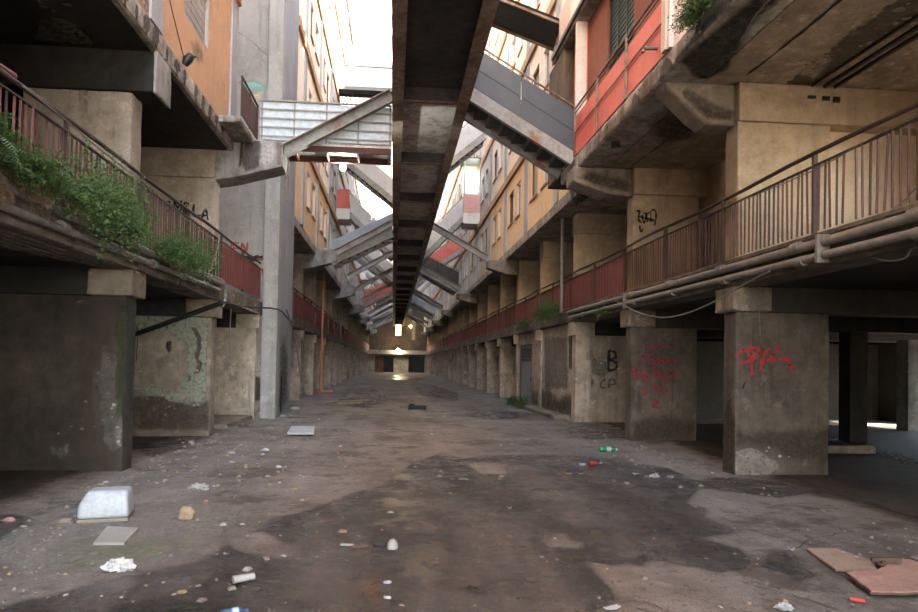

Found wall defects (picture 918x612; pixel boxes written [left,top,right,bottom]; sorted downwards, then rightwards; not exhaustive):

leakage [676,0,776,79]
peeling [70,352,122,451]
leakage [117,301,209,456]